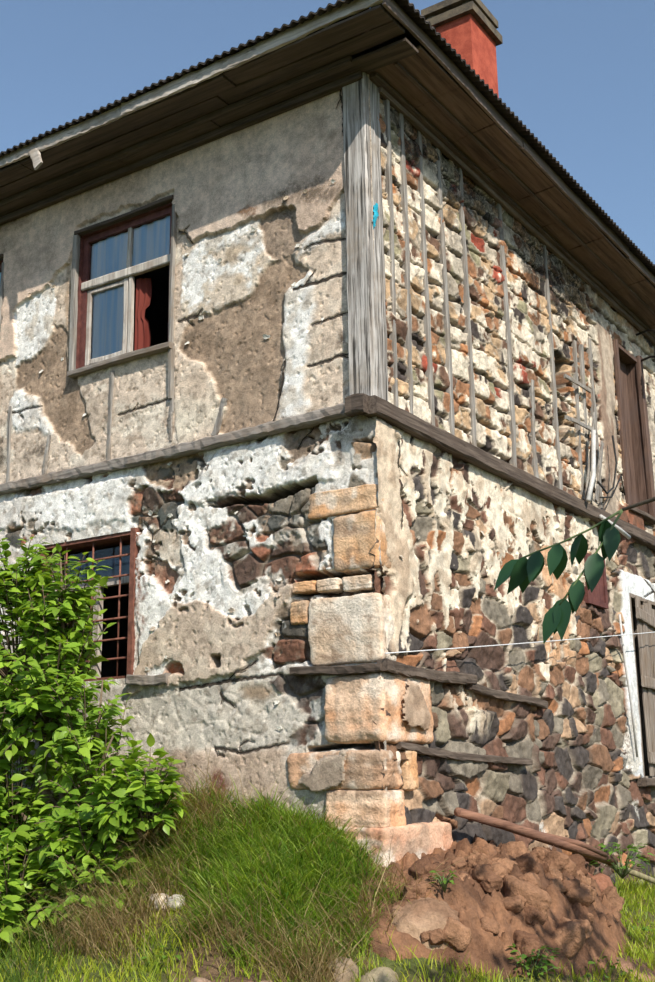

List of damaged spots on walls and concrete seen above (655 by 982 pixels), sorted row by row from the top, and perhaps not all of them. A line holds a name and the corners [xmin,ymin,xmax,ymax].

crack [305,238,346,249]
crack [293,272,347,290]
flaking render [178,193,349,433]
flaking render [12,249,96,456]
spalling [551,409,570,446]
flaking render [618,503,644,530]
peeling [125,426,627,748]
crack [214,740,286,757]